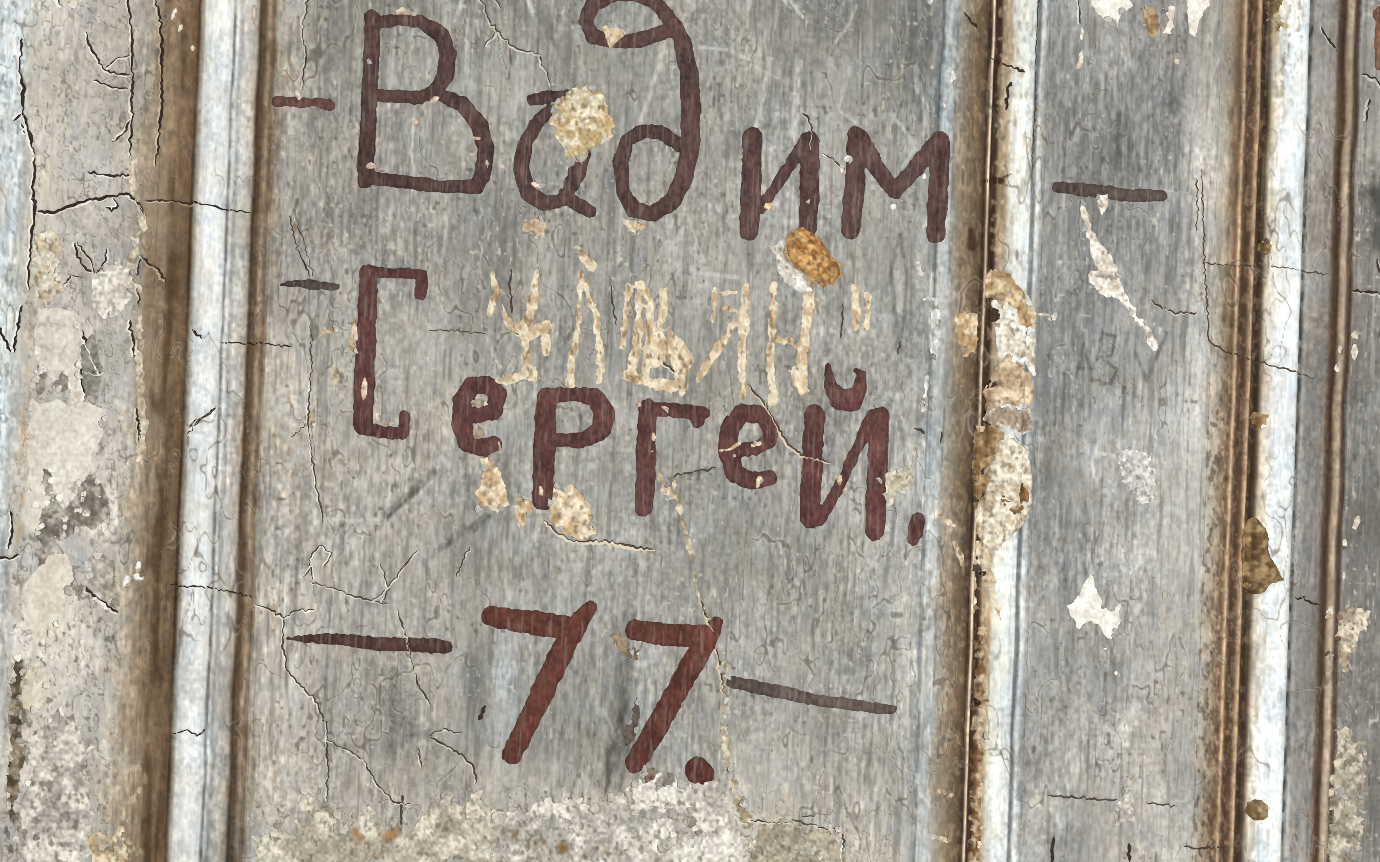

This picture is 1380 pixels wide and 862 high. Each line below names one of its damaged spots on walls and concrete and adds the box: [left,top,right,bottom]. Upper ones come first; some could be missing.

peeling [1091,0,1210,43]
spalling [548,82,618,167]
crack [0,0,251,404]
peeling [1080,194,1158,351]
crack [747,384,830,464]
spalling [919,269,1057,510]
crack [0,511,20,561]
crack [170,323,486,825]
crack [544,520,655,552]
peeling [1067,574,1121,650]
spalling [249,651,846,862]
crack [750,815,846,861]